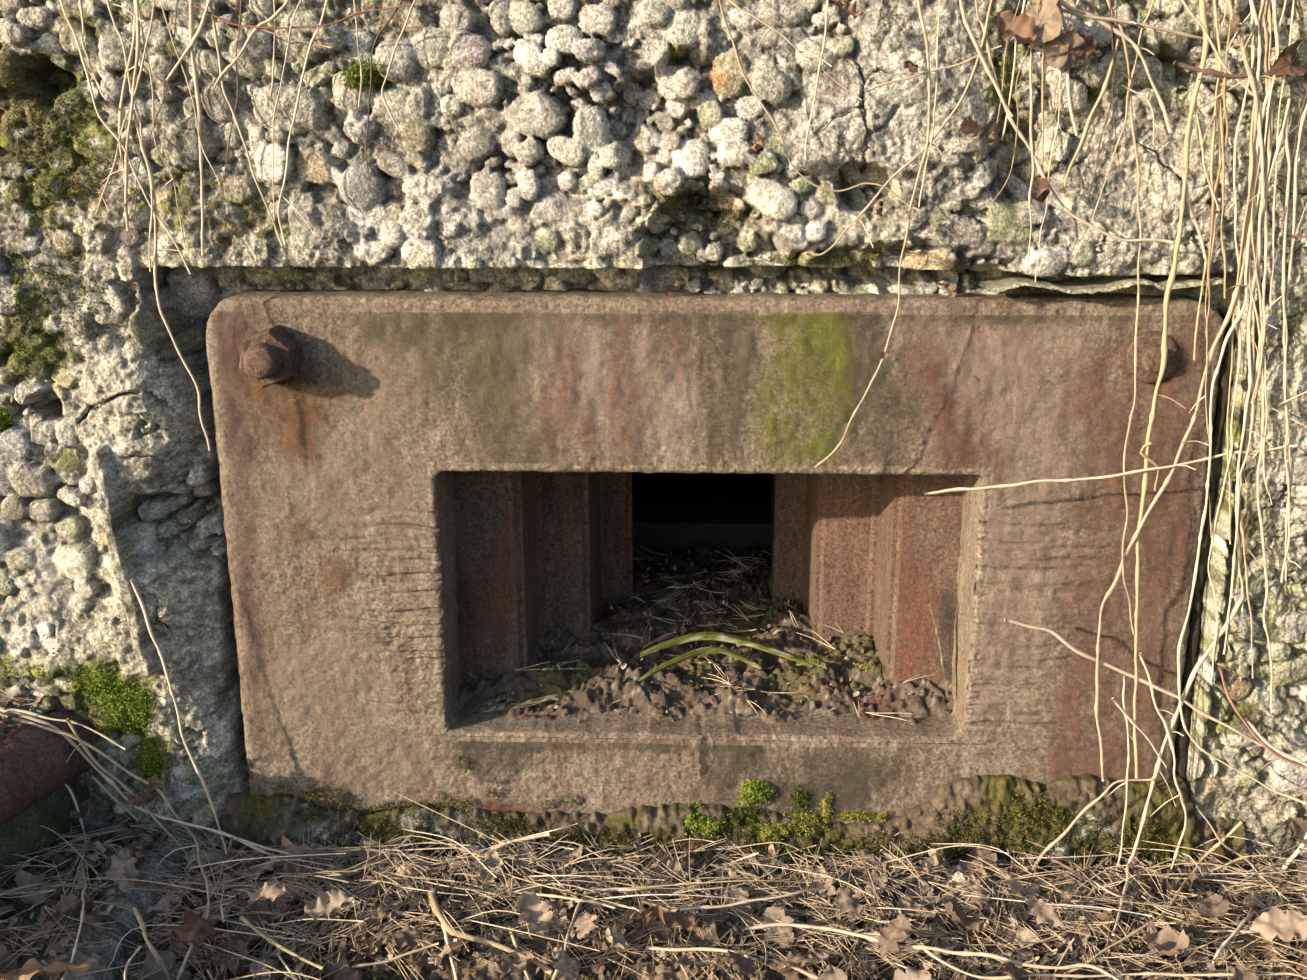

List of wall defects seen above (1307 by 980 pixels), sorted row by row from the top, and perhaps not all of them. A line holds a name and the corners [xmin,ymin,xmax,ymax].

crack [821,55,897,171]
water stain [335,310,791,468]
water stain [788,311,913,466]
corrosion [1047,315,1211,784]
corrosion [479,690,571,713]
corrosion [639,632,827,683]
corrosion [928,599,948,699]